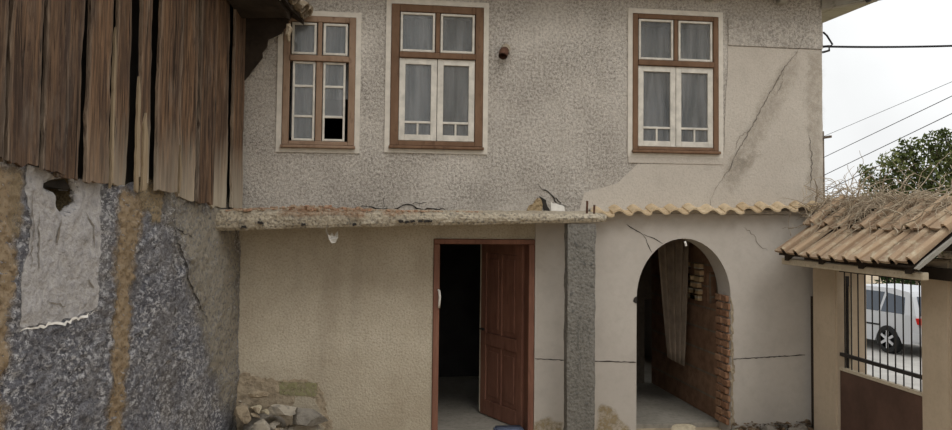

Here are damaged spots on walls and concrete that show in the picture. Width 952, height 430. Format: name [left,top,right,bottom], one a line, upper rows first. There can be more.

crack [710,33,806,206]
flaking render [20,164,102,332]